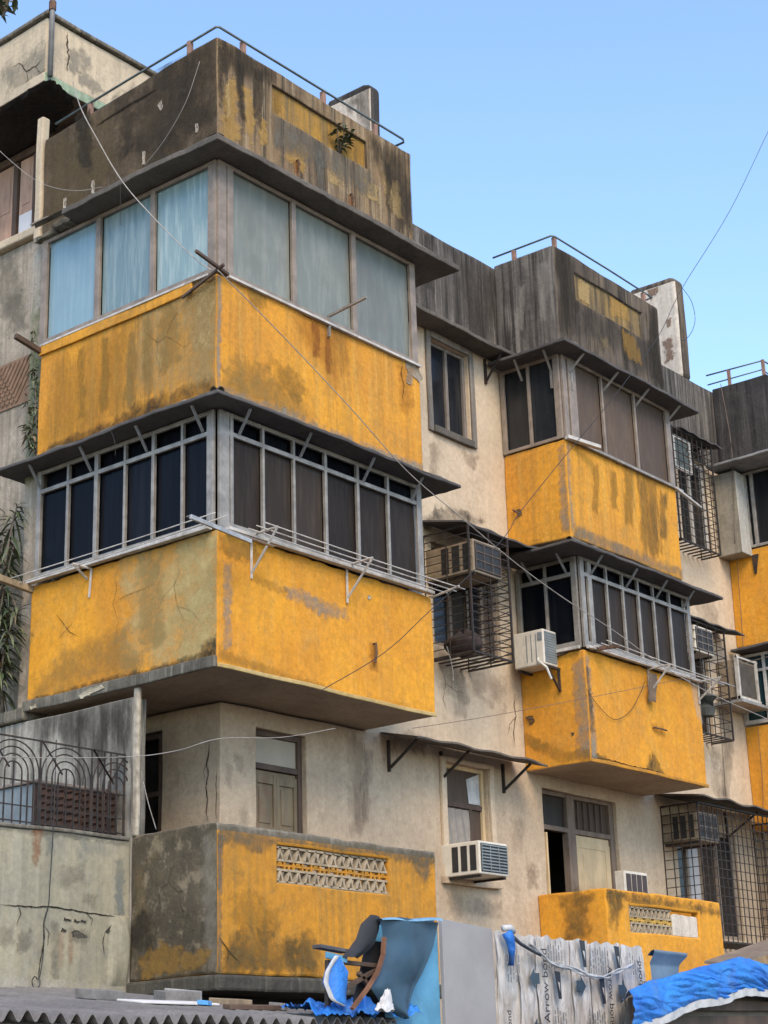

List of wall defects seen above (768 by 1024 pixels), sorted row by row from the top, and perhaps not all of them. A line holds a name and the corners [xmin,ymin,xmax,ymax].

crack [13,35,70,84]
water stain [374,141,413,228]
peeling [577,279,590,305]
peeling [611,296,642,365]
crack [203,741,217,821]
crack [10,905,114,978]